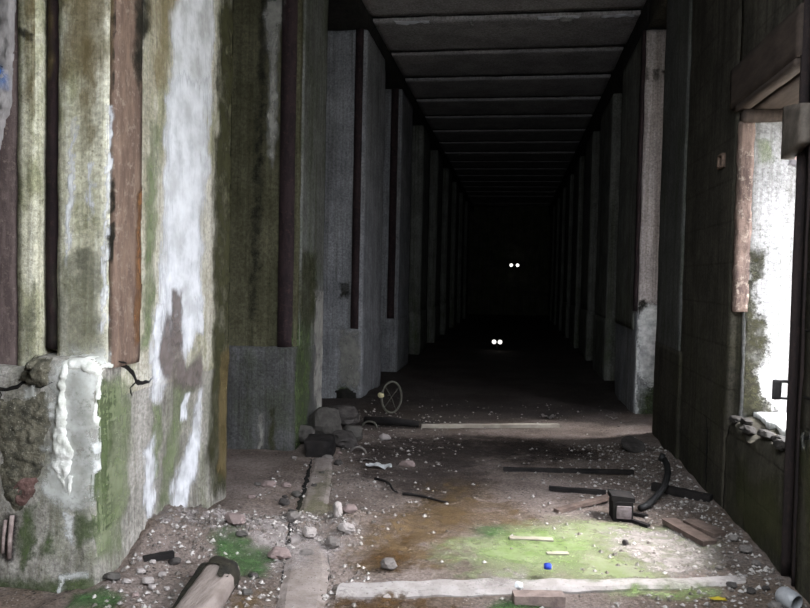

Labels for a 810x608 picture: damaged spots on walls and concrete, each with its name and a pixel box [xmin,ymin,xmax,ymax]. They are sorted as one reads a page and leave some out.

peeling [0,0,17,149]
rust [134,0,151,82]
water stain [250,0,282,312]
rust [107,222,116,261]
rust [134,188,142,342]
water stain [150,0,233,507]
crack [0,381,55,398]
spalling [0,351,60,561]
water stain [42,349,131,557]
crack [119,361,154,396]
water stain [143,444,156,516]
water stain [57,573,88,593]